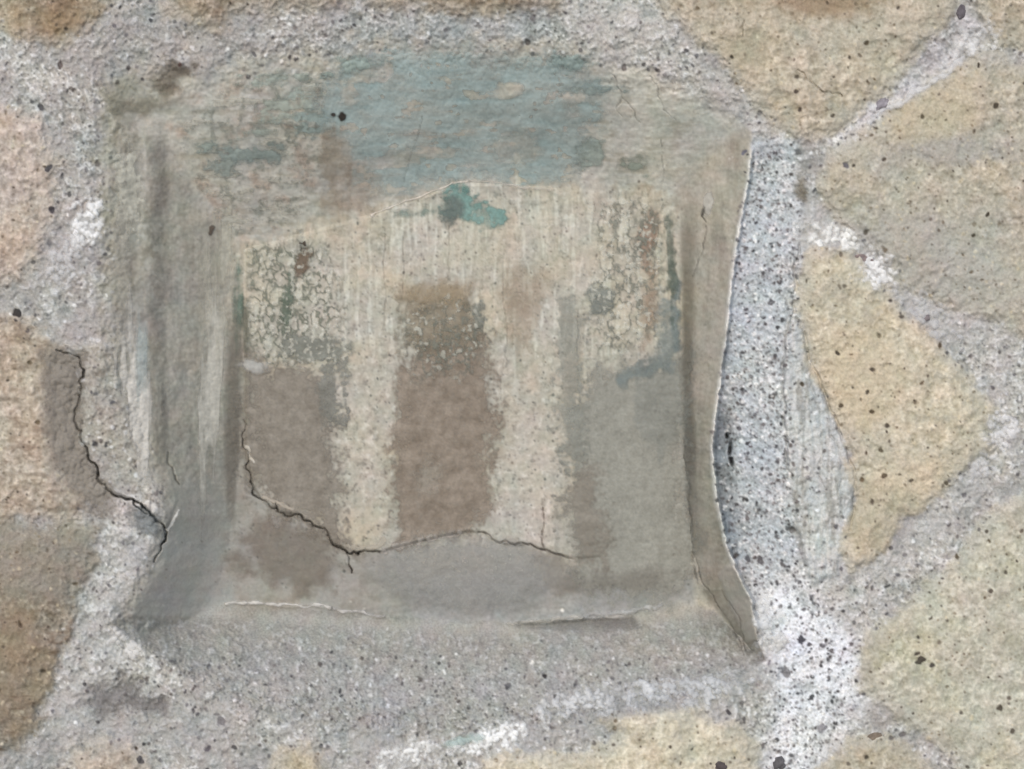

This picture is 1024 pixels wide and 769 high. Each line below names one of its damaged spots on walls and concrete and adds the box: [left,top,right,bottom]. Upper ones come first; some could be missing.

crack [76,363,167,545]
water stain [198,206,352,551]
peeling [244,246,351,372]
crack [275,508,373,555]
water stain [385,294,505,552]
peeling [587,203,662,344]